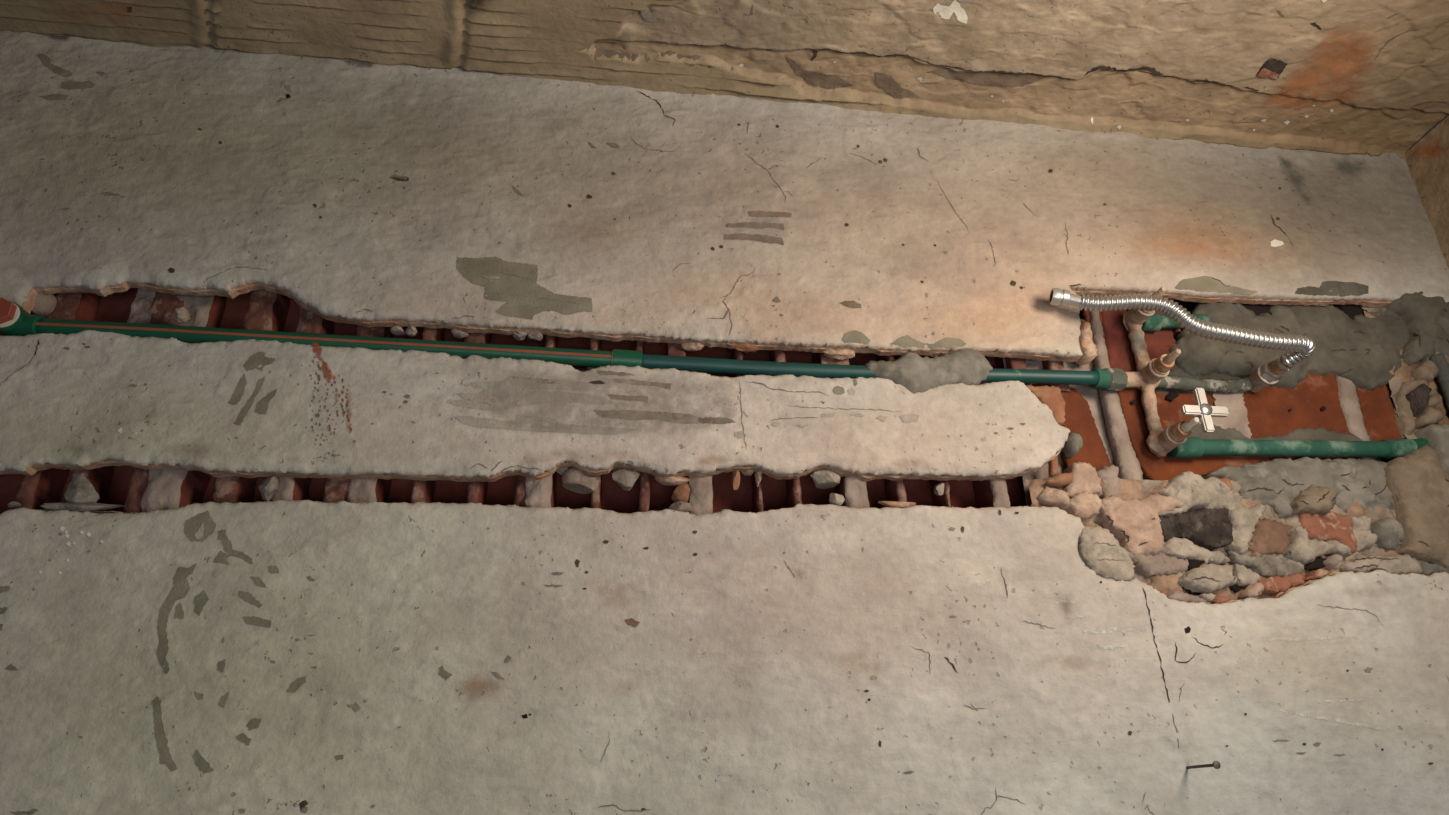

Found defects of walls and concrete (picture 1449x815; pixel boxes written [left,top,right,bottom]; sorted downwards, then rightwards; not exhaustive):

rust [310,343,352,445]